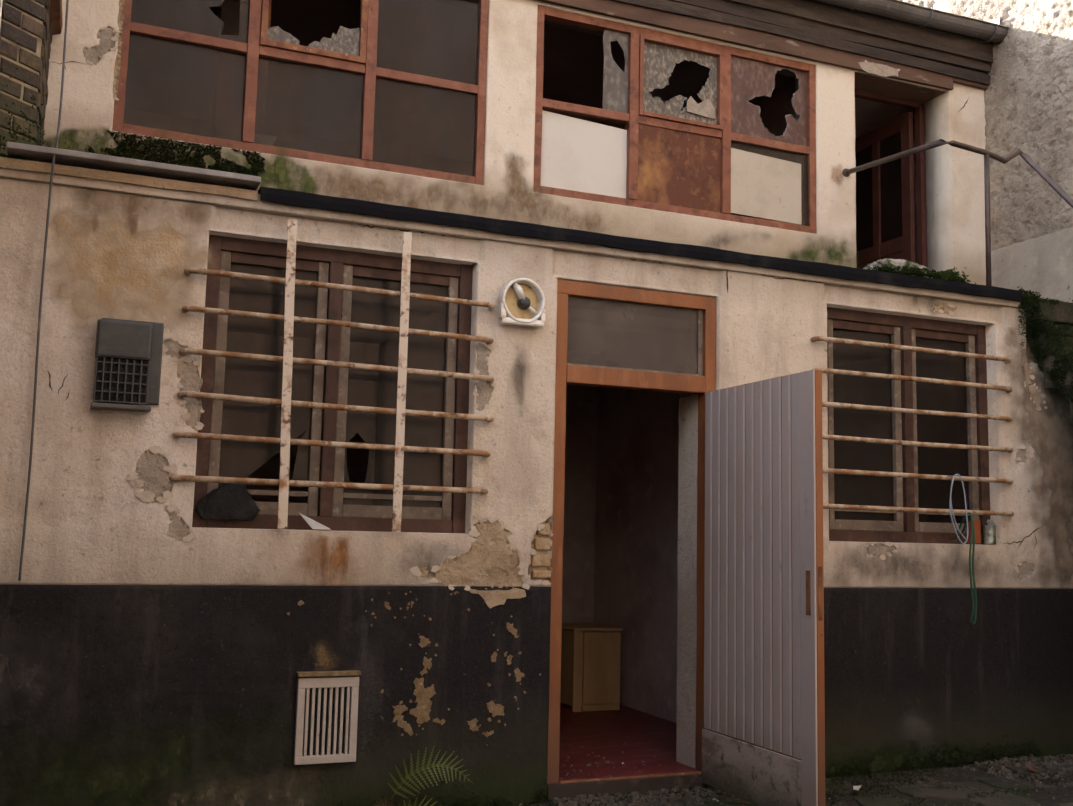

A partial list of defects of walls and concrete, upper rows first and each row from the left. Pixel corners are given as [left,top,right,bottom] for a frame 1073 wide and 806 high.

peeling [83,0,125,101]
peeling [858,60,900,77]
leakage [44,129,108,155]
leakage [275,156,456,210]
leakage [471,156,547,220]
corrosion [638,124,721,213]
peeling [162,337,204,431]
corrosion [308,539,348,574]
flaking render [410,515,554,608]
crack [1000,526,1043,549]
peeling [380,633,450,736]
peeling [467,649,527,745]